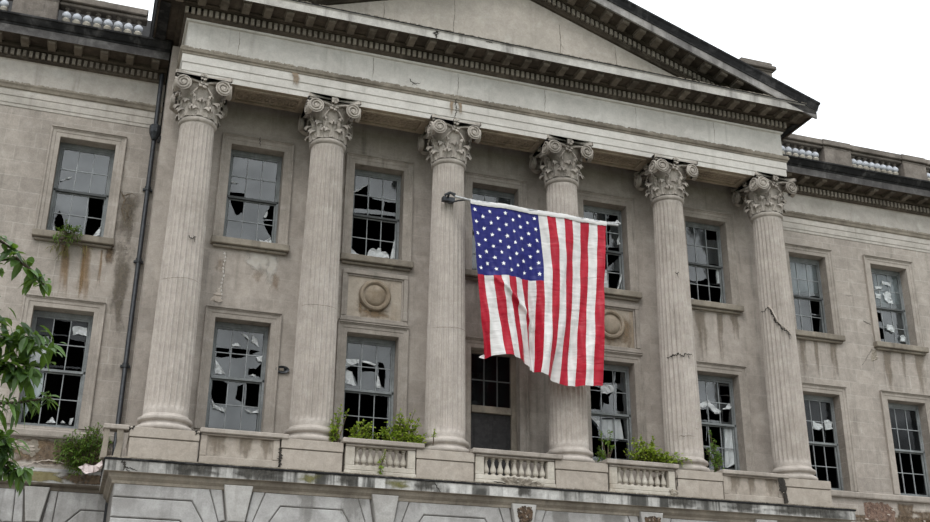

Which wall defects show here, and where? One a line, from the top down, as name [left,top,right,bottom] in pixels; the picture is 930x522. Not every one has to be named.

crack [761,305,792,338]
peeling [11,439,41,457]